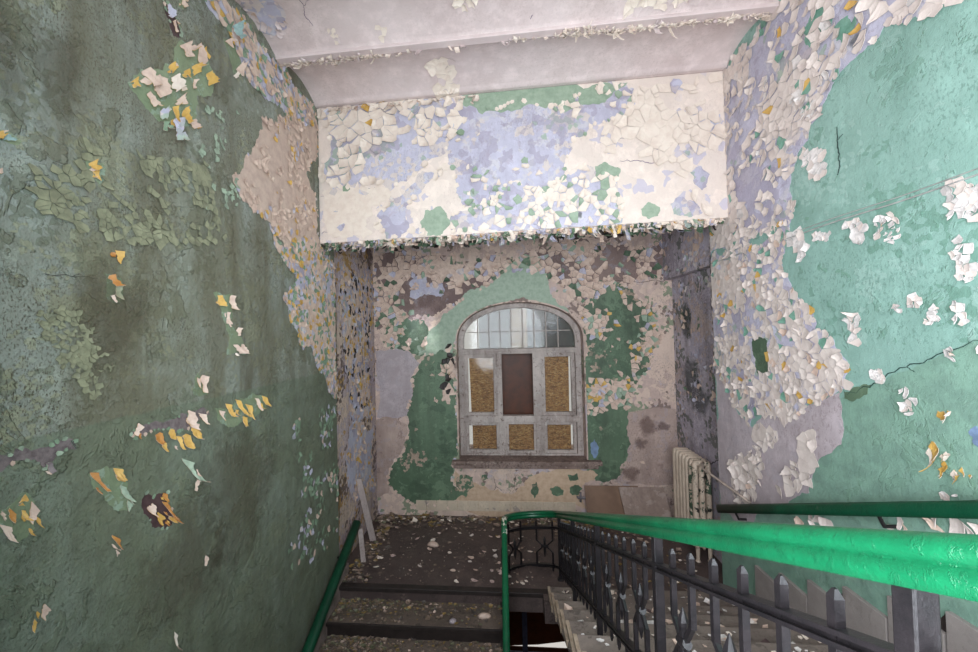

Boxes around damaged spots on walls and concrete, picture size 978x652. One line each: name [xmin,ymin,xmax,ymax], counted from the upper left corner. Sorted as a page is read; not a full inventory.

crack [835,128,843,175]
peeling [940,176,978,222]
peeling [25,0,970,517]
peeling [948,235,978,283]
crack [847,340,978,395]
peeling [919,441,972,501]
peeling [0,492,44,543]
peeling [88,466,184,530]
peeling [288,450,340,570]
peeling [794,515,833,526]
peeling [922,518,978,534]
peeling [32,604,51,633]